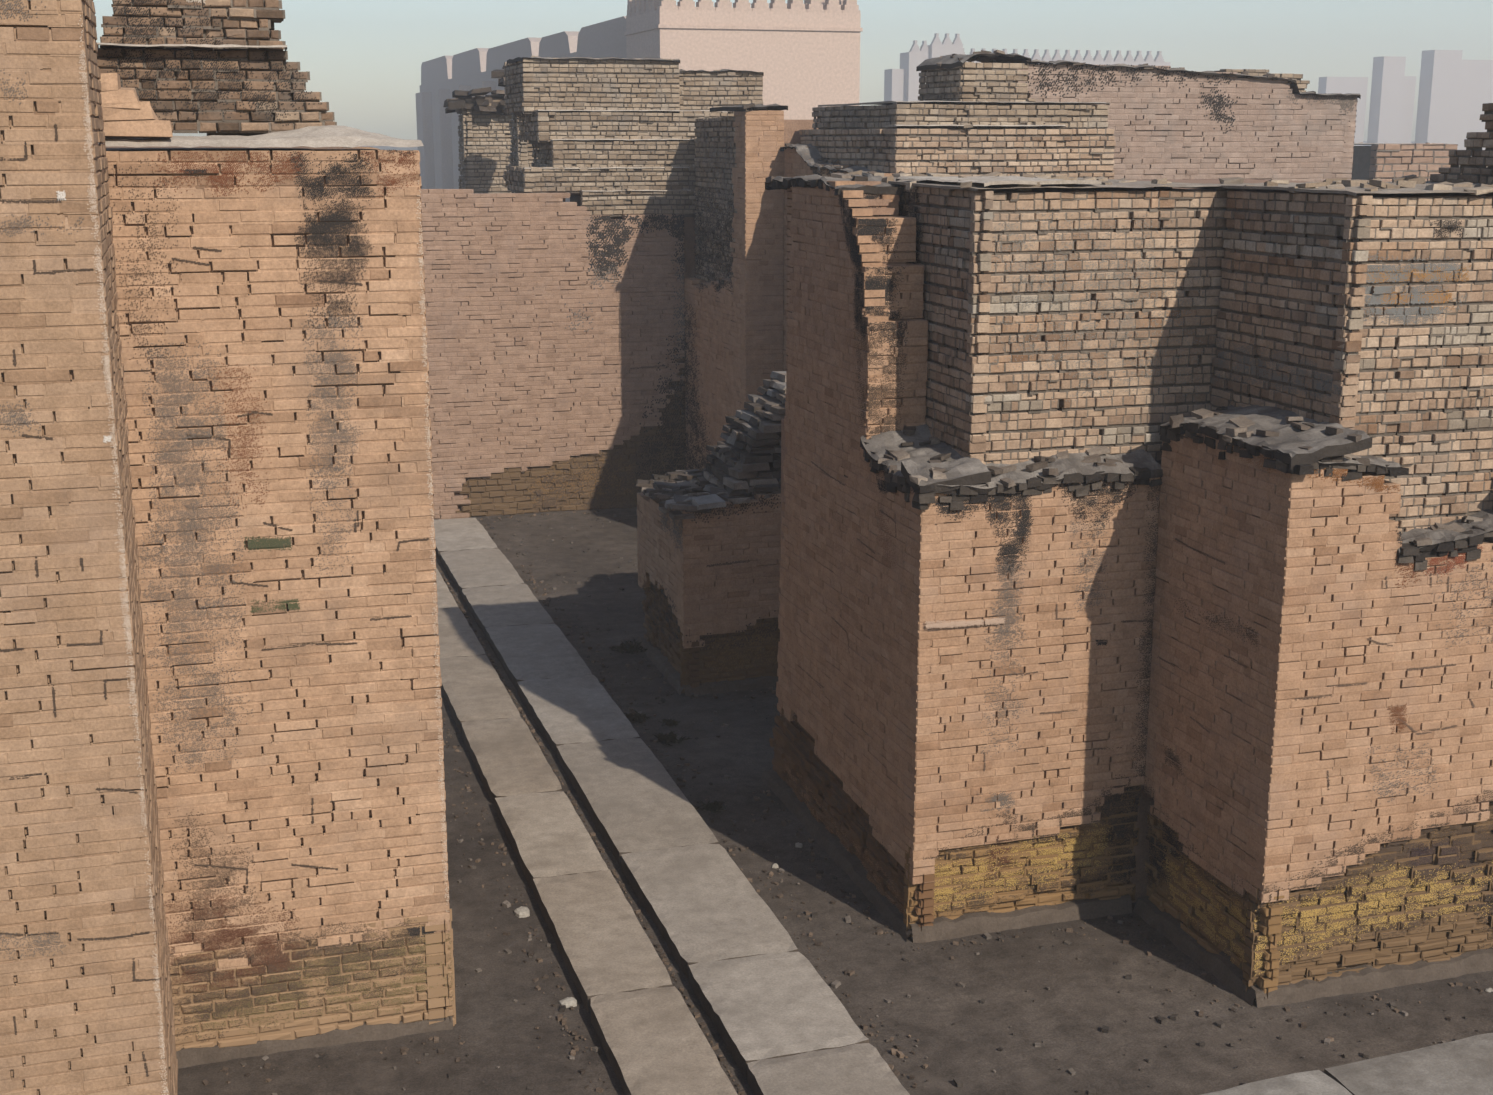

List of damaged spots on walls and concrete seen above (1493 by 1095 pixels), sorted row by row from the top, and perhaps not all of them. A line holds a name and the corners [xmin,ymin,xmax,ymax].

damp [290,151,376,577]
damp [168,810,424,1047]
damp [783,479,1493,976]